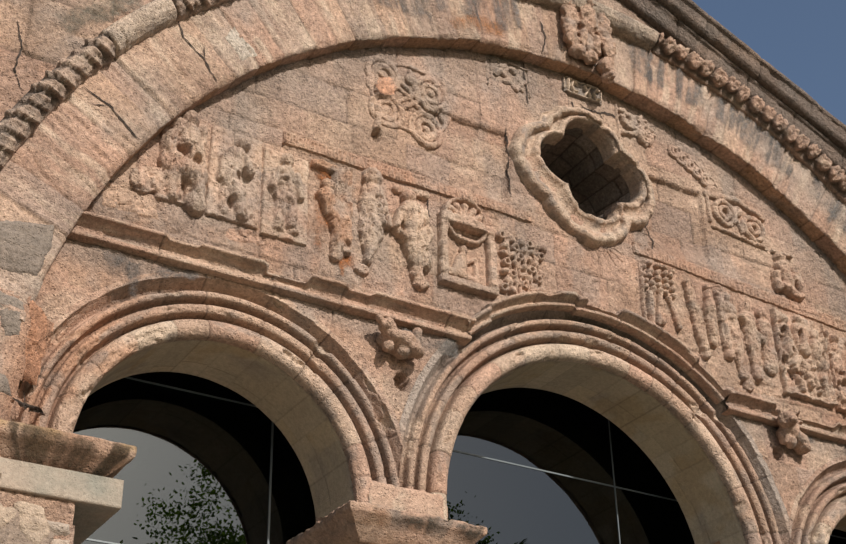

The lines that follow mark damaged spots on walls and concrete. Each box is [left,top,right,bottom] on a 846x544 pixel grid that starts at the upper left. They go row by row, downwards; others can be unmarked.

crack [13,20,33,89]
crack [86,88,139,139]